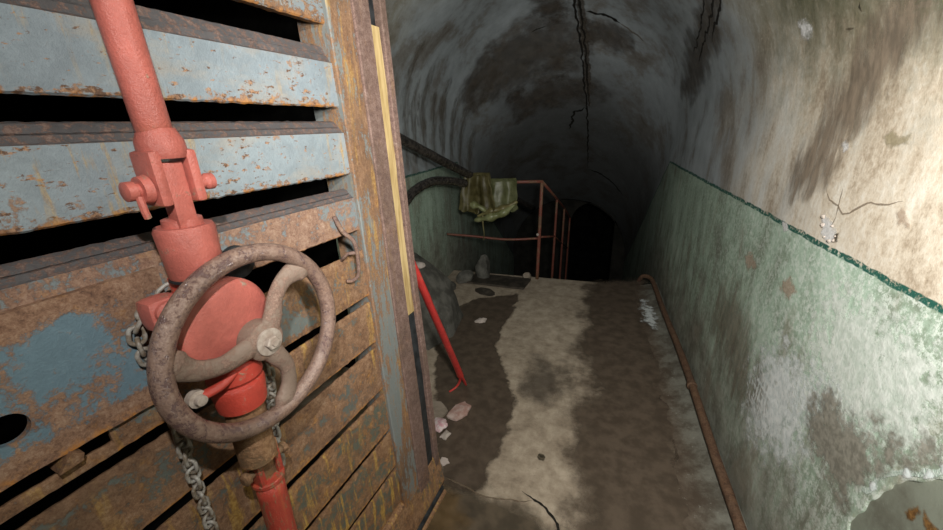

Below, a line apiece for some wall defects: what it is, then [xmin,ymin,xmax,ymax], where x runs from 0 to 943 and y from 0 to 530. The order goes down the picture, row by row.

water stain [464,0,628,121]
crack [569,0,643,195]
crack [693,0,721,60]
water stain [791,0,931,202]
water stain [426,294,543,530]
crack [444,477,560,530]
water stain [565,280,689,530]
peeling [807,388,943,513]
rust [906,508,939,530]